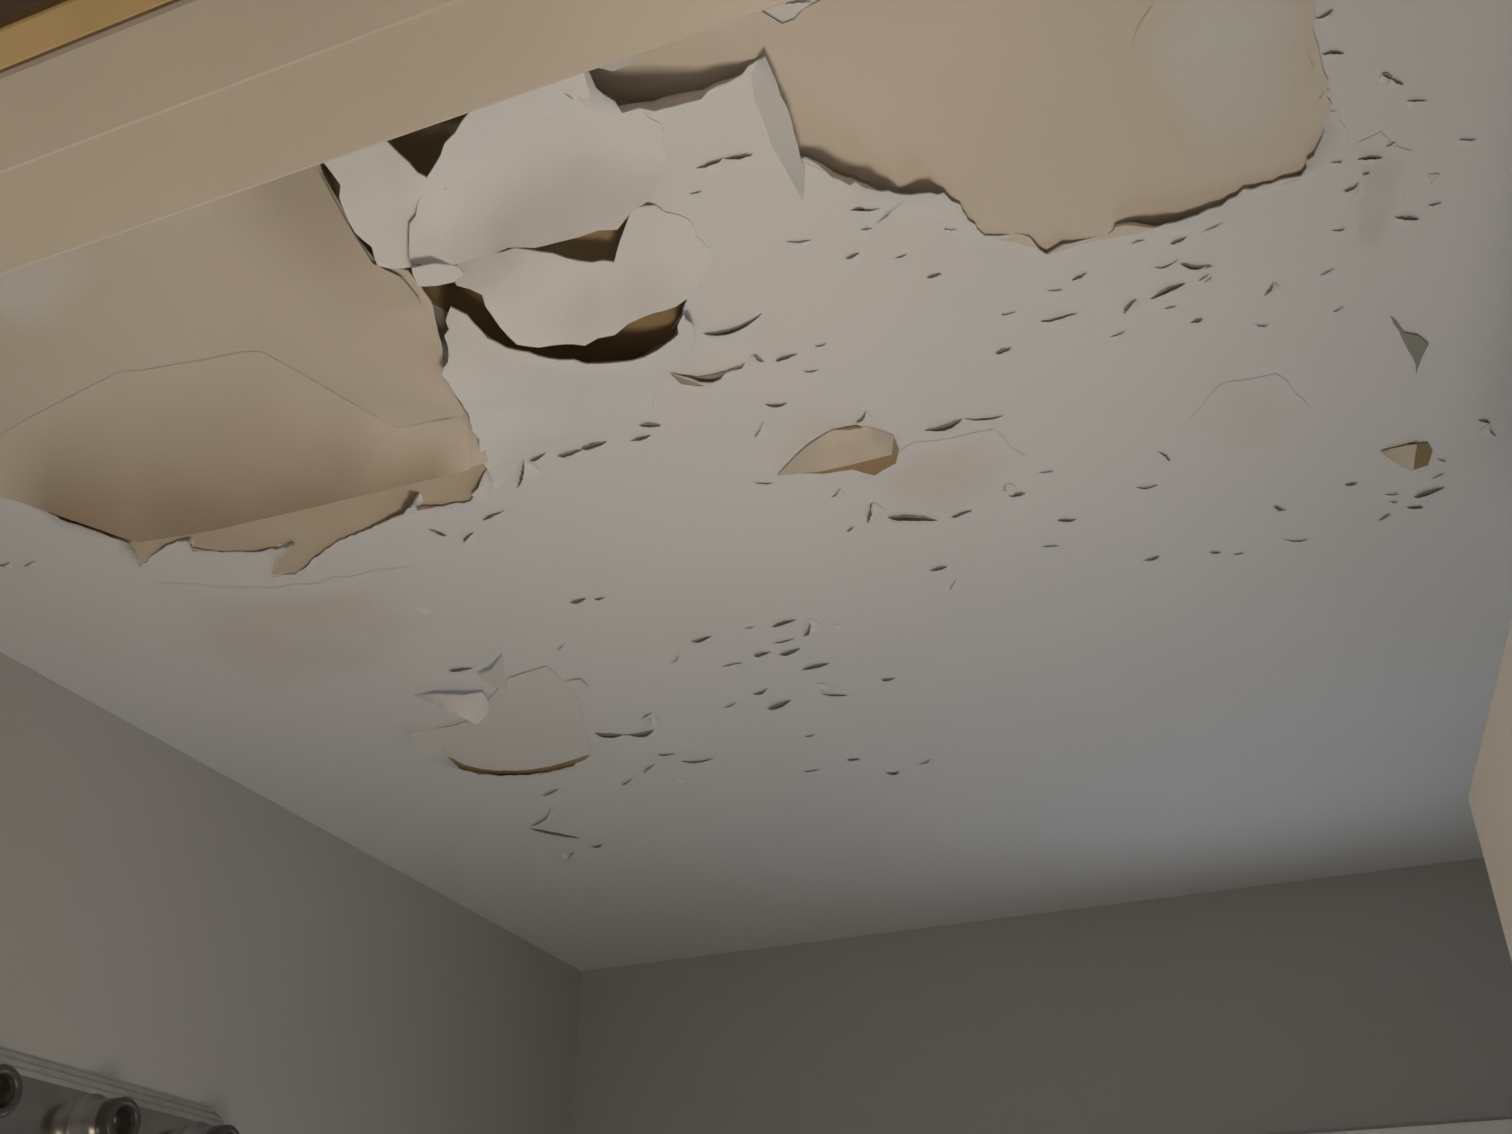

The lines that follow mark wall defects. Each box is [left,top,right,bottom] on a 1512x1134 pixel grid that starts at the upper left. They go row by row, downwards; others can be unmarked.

peeling [1378,73,1426,109]
peeling [1394,203,1441,226]
peeling [0,0,1396,579]
peeling [1391,317,1429,373]
peeling [1379,442,1445,522]